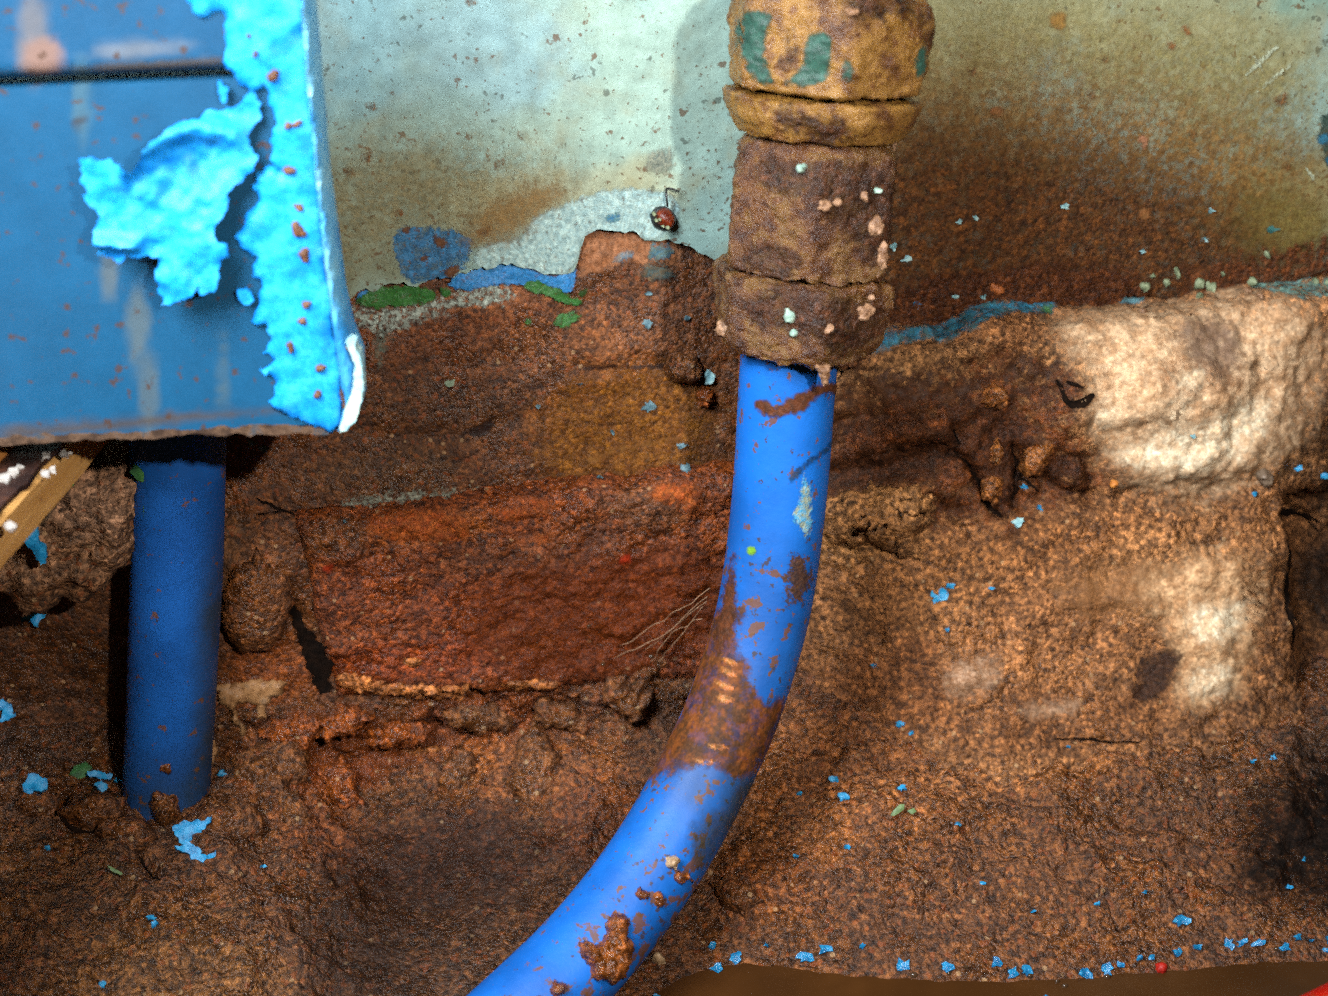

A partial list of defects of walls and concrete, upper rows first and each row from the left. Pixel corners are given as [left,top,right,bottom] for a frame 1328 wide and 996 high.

peeling [79,0,366,434]
crack [1280,507,1321,650]
leakage [1129,649,1183,708]